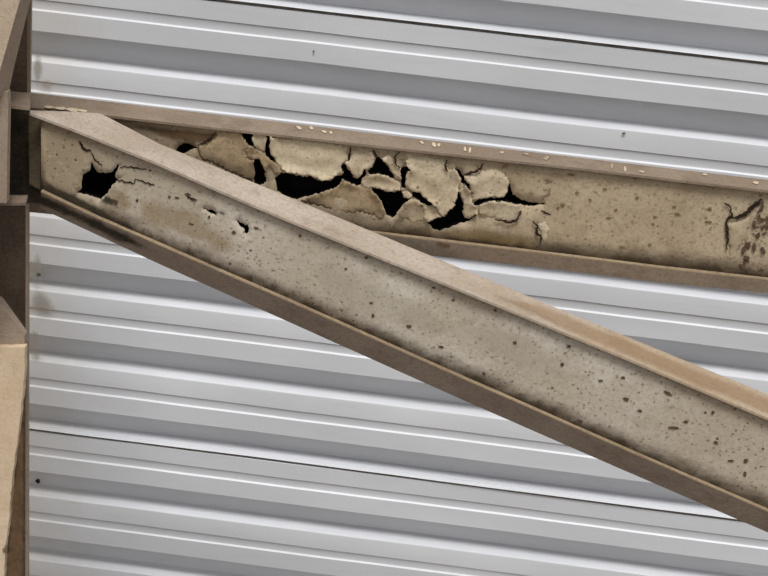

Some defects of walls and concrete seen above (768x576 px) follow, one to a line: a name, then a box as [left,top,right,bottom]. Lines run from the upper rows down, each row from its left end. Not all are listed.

crack [79,142,155,186]
peeling [198,126,523,223]
peeling [538,222,550,242]
crack [724,199,761,250]